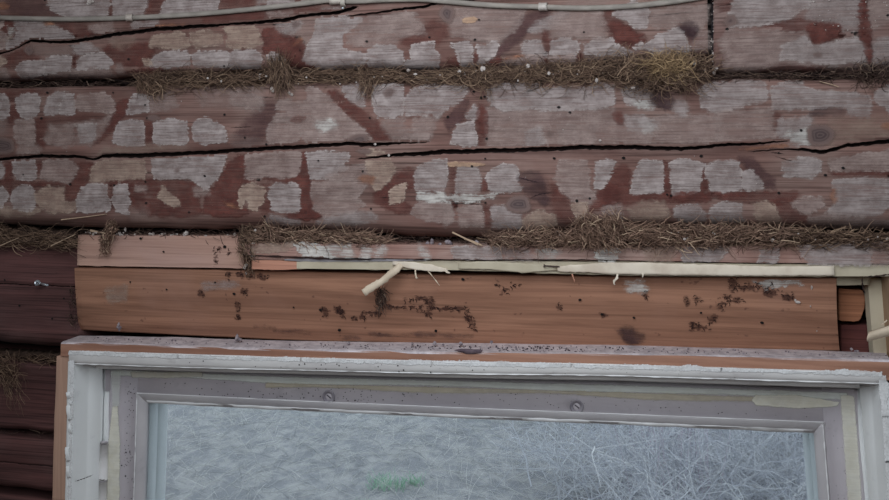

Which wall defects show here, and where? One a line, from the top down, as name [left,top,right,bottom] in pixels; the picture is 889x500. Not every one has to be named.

peeling [0,20,123,79]
crack [0,3,439,54]
peeling [267,0,307,32]
peeling [302,11,440,71]
peeling [450,0,889,148]
peeling [0,92,228,217]
peeling [237,83,558,230]
crack [0,126,889,161]
peeling [556,159,616,218]
peeling [603,158,763,225]
peeling [781,149,889,229]